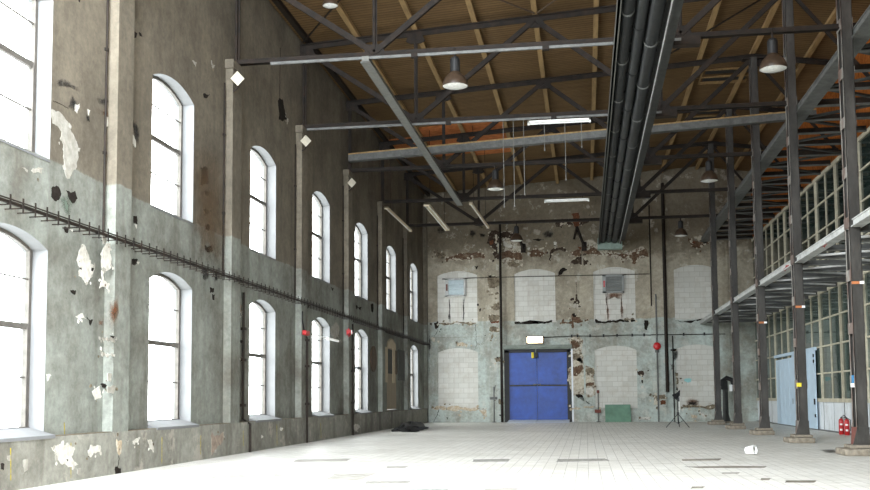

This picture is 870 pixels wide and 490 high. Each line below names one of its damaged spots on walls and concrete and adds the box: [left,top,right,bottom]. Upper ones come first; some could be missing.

peeling [50,109,80,179]
spalling [51,186,78,213]
peeling [74,236,114,293]
spalling [432,229,649,341]
peeling [89,373,118,402]
peeling [557,308,601,411]
peeling [51,441,102,475]